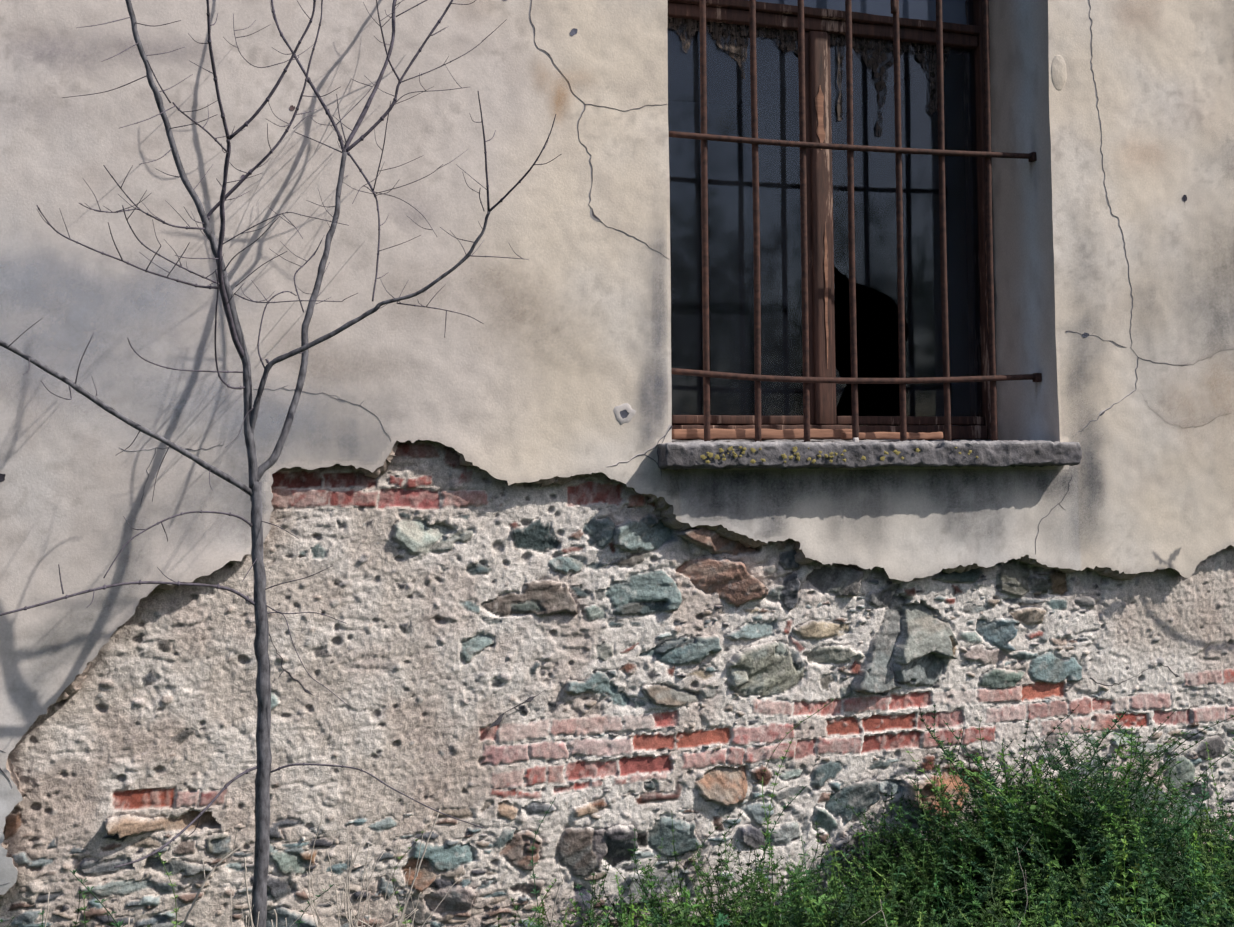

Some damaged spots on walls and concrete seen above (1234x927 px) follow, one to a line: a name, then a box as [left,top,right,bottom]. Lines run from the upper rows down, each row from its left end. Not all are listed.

crack [529,0,669,259]
crack [1066,0,1191,437]
spalling [0,440,1234,927]
crack [1035,475,1072,554]